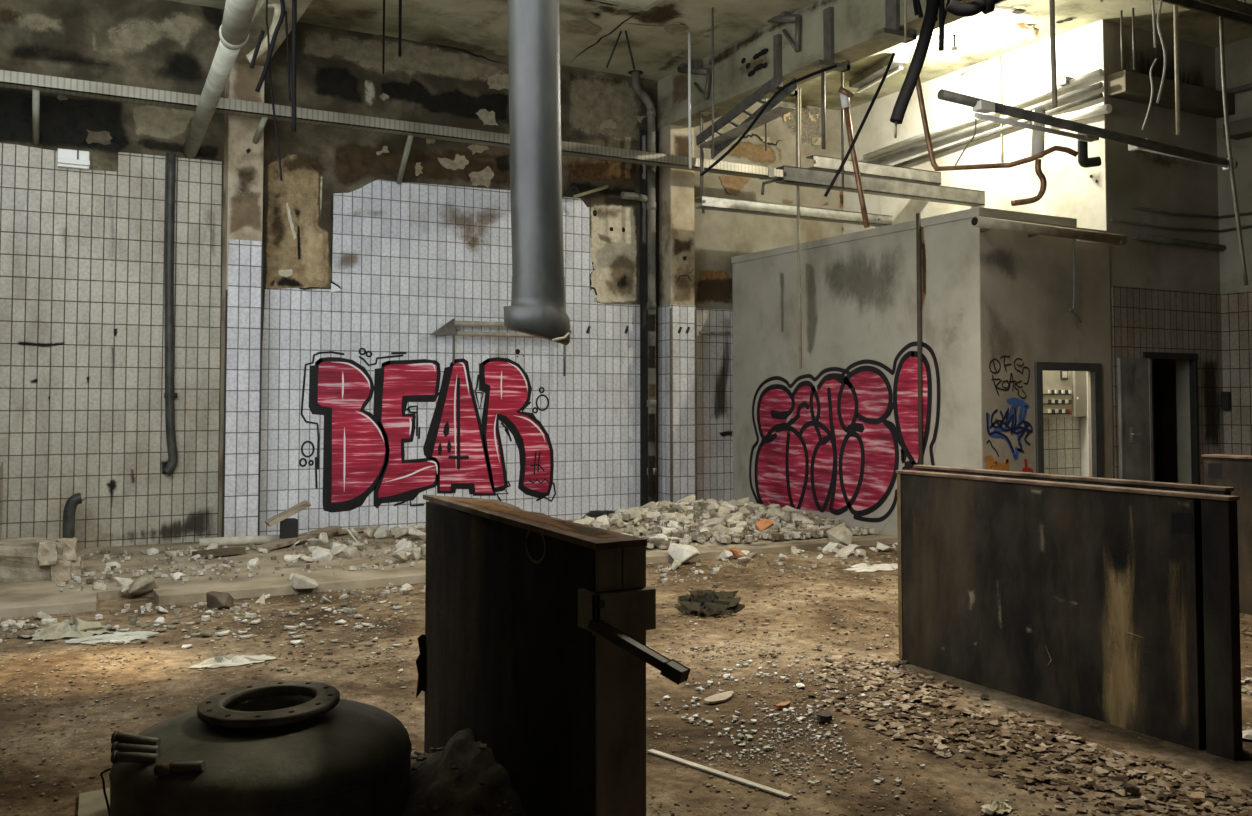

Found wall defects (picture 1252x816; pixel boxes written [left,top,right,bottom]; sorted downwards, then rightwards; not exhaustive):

peeling [86,130,112,145]
peeling [133,105,195,139]
peeling [266,139,509,293]
peeling [589,205,637,303]
damp [806,265,816,351]